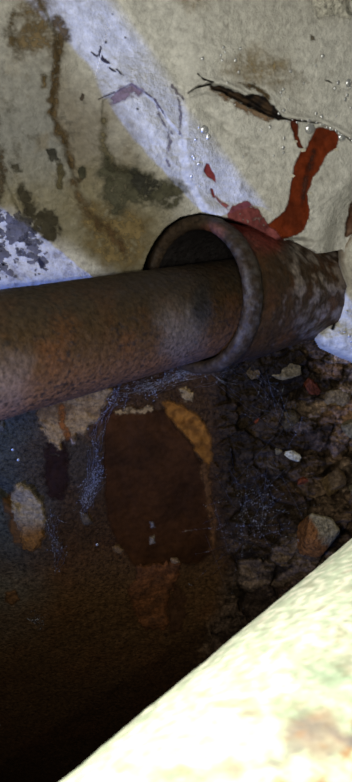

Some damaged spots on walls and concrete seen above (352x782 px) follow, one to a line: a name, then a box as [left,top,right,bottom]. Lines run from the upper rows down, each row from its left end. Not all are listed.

damp [8,0,86,189]
crack [191,73,318,124]
damp [0,151,21,198]
damp [97,118,184,215]
peeling [0,209,49,280]
damp [17,184,62,241]
rust [215,196,283,240]
peeling [3,483,47,552]